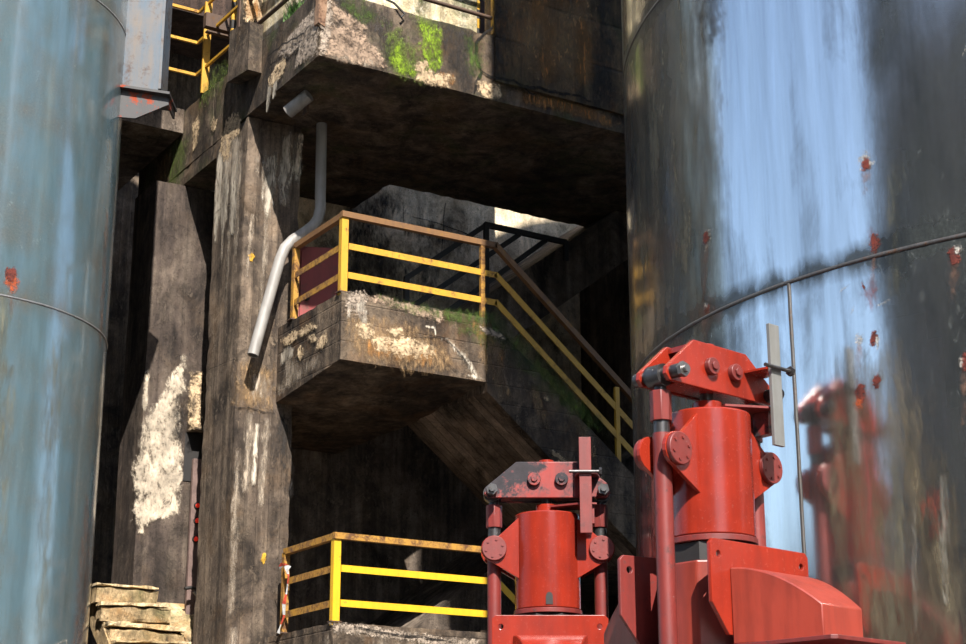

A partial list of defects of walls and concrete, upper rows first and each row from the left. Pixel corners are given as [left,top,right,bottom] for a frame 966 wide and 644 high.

spalling [266,0,386,112]
corrosion [5,267,20,291]
spalling [279,323,327,389]
spalling [345,290,449,370]
flaking render [134,356,203,533]